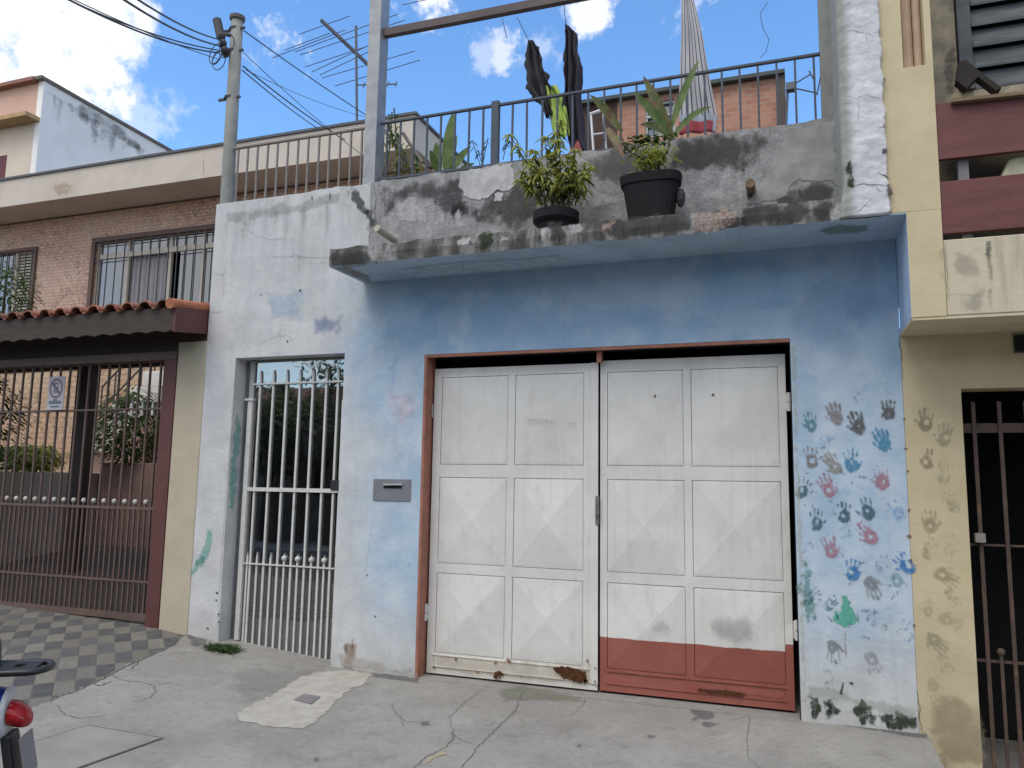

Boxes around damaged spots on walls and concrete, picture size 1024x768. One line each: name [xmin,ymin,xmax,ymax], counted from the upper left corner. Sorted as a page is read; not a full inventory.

damp [78,107,140,150]
flaking render [459,163,515,201]
damp [385,179,537,249]
rust [553,659,596,684]
crack [414,657,555,768]
damp [808,696,840,719]
damp [853,699,917,730]